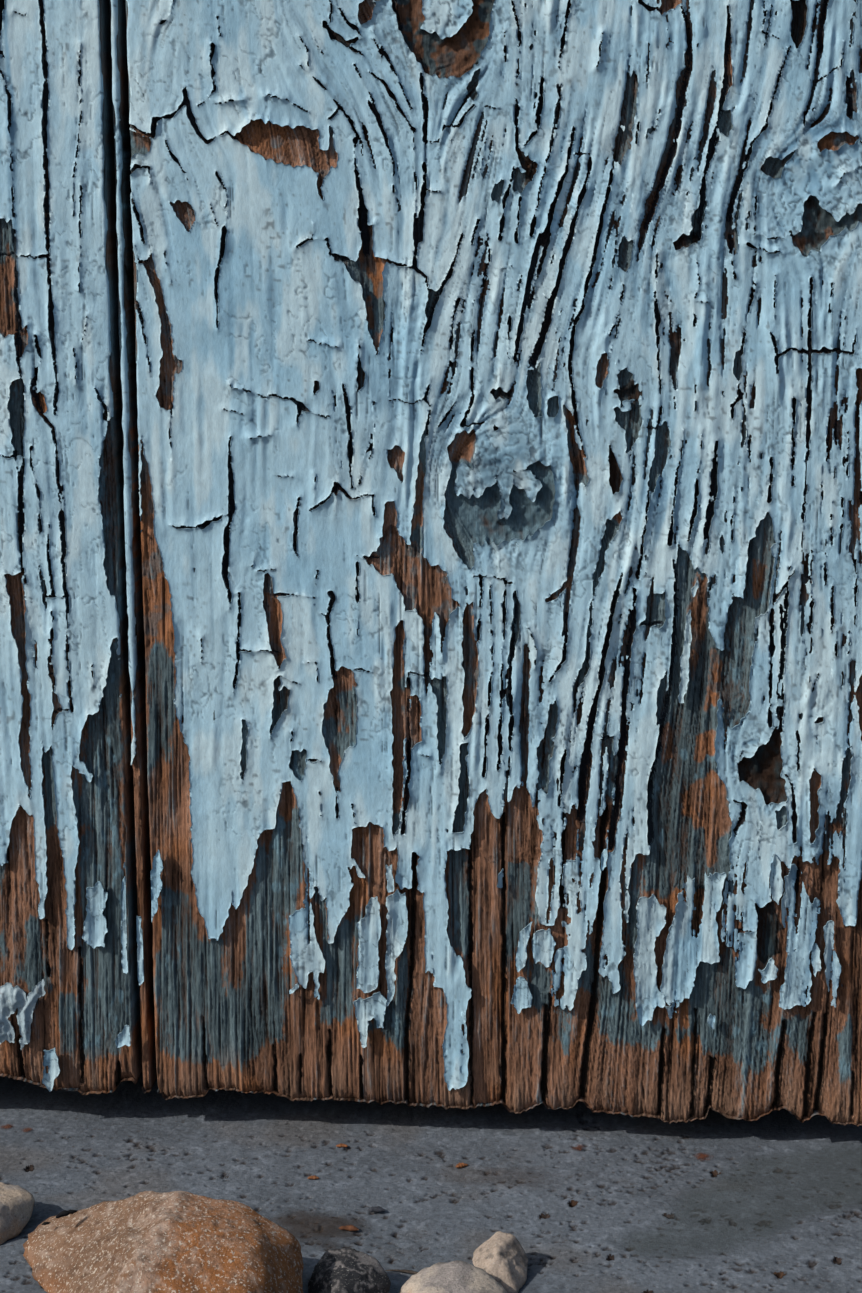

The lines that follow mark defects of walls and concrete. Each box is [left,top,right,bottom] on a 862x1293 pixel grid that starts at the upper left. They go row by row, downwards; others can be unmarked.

peeling [323,0,495,100]
crack [132,16,238,328]
peeling [232,119,338,199]
peeling [789,195,862,257]
peeling [8,375,47,456]
crack [0,0,94,713]
peeling [95,388,119,598]
crack [137,303,151,372]
crack [173,0,862,1118]
peeling [490,362,589,486]
peeling [595,353,671,496]
peeling [0,425,862,1125]